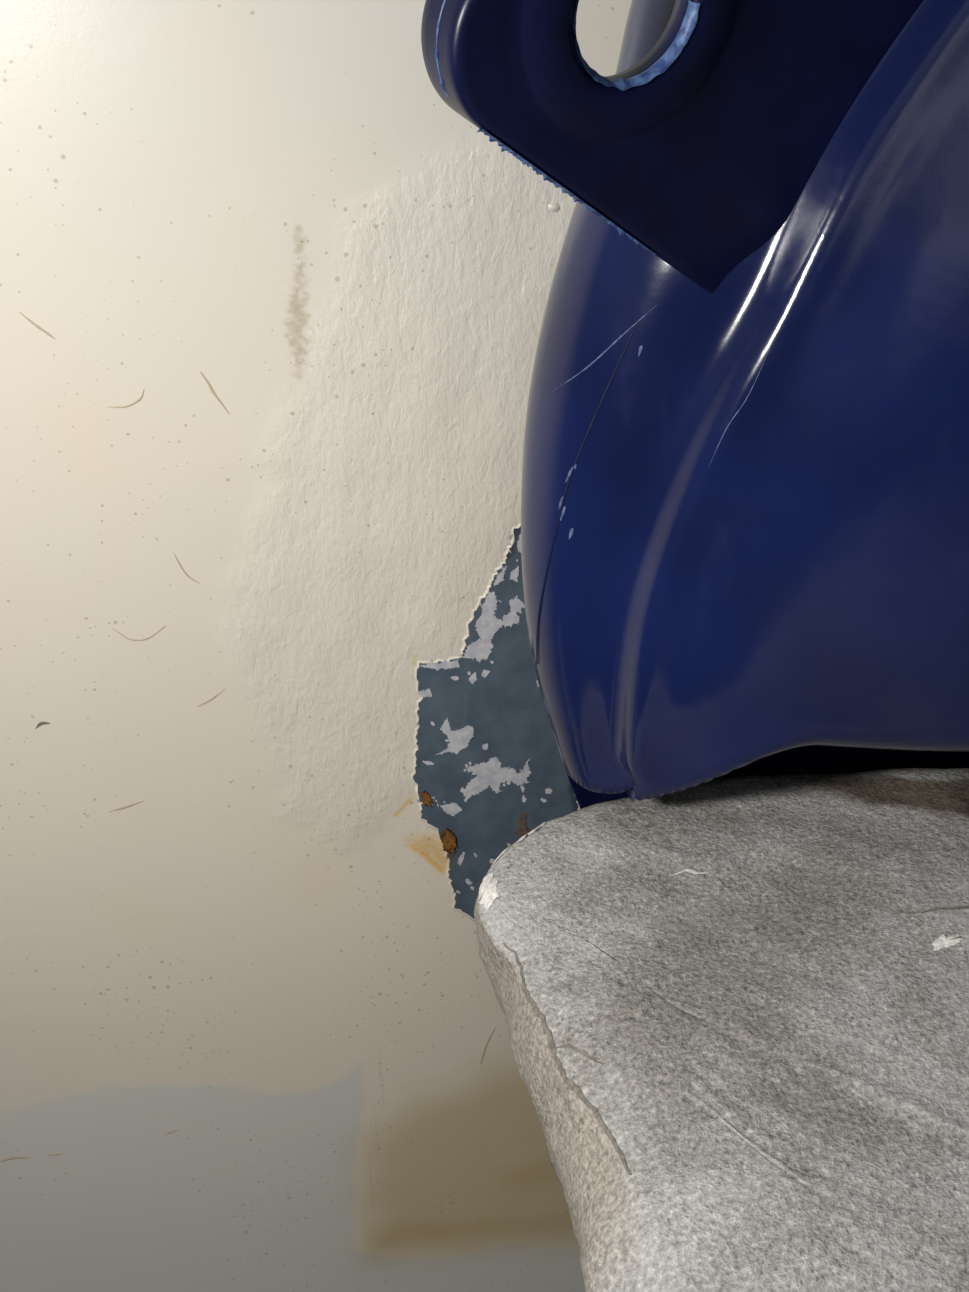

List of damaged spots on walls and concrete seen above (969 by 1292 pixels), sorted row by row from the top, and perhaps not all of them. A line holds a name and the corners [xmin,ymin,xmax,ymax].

peeling [411,523,580,921]
corrosion [419,790,433,807]
corrosion [514,813,532,838]
corrosion [439,828,457,854]